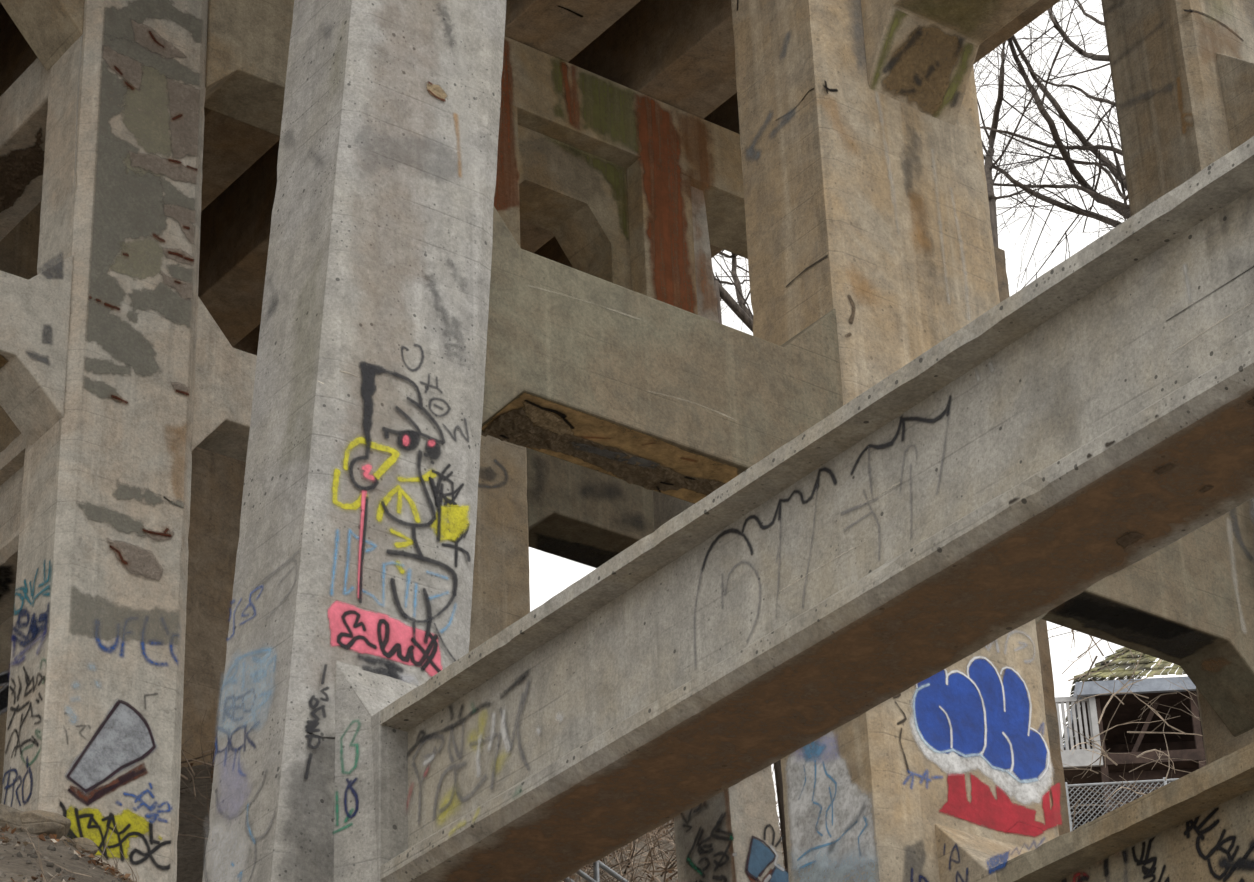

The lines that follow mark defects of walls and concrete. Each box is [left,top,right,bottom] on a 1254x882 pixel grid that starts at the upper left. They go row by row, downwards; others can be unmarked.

peeling [84,0,202,404]
corrosion [494,40,519,210]
corrosion [636,96,718,314]
spalling [883,26,964,114]
peeling [71,588,179,644]
spalling [79,485,184,580]
spalling [481,393,738,503]
leakage [444,392,1254,882]